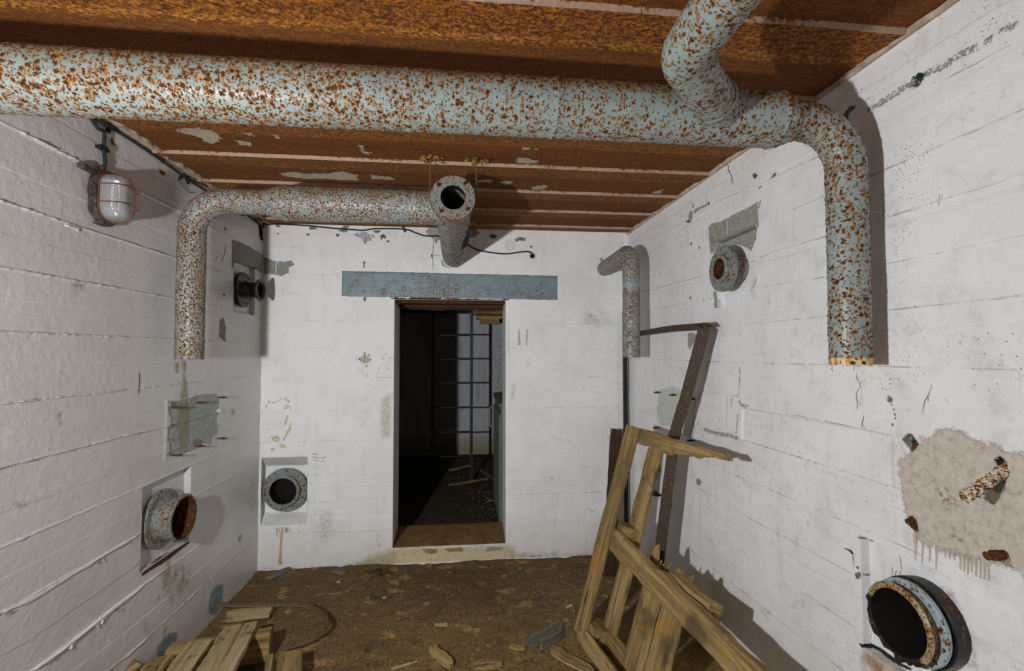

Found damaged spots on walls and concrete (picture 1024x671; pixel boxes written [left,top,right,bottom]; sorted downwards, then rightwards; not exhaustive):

peeling [176,127,221,144]
peeling [279,171,395,181]
peeling [224,227,294,276]
spalling [902,433,919,452]